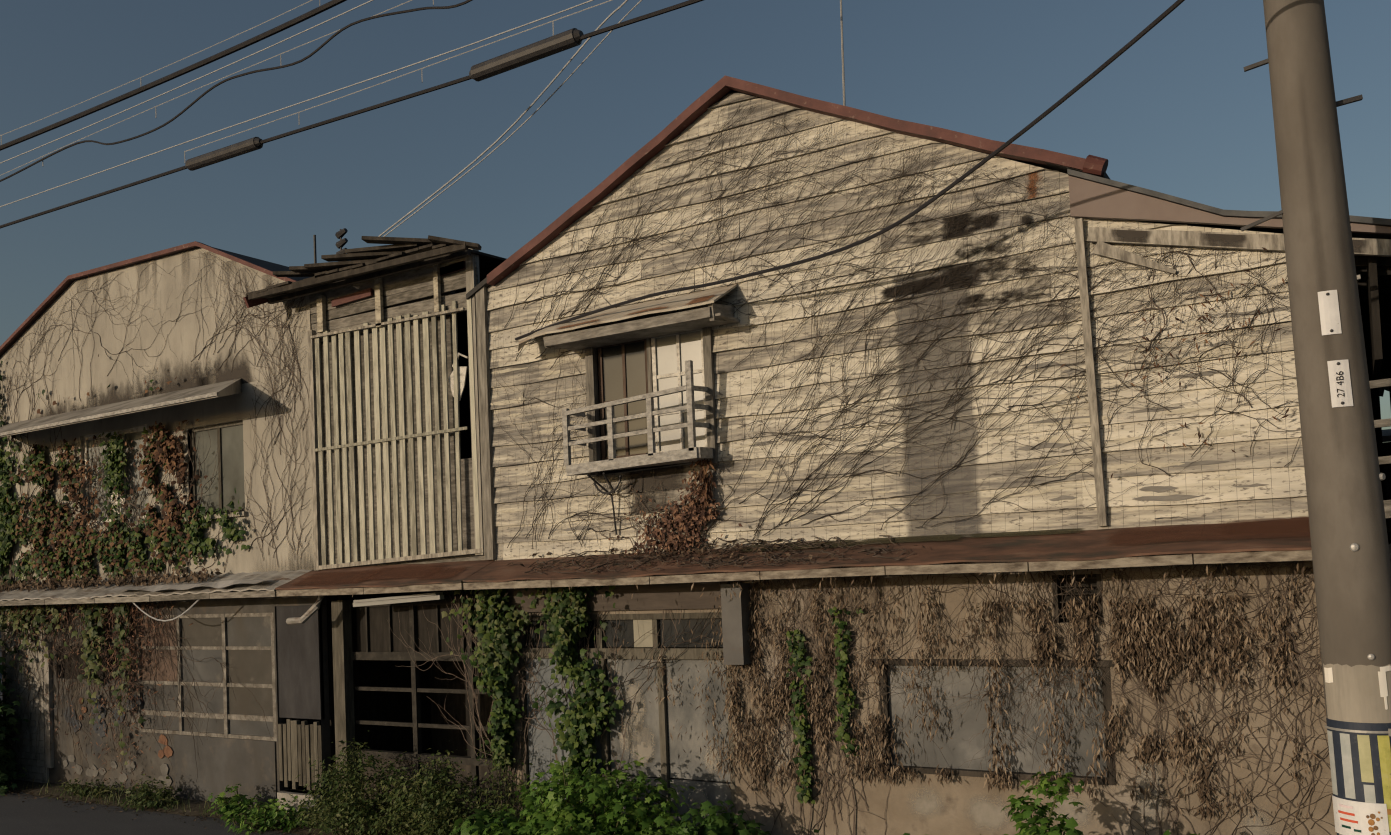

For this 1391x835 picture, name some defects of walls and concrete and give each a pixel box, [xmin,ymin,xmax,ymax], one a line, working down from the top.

leakage [741,213,1081,552]
corrosion [292,565,464,586]